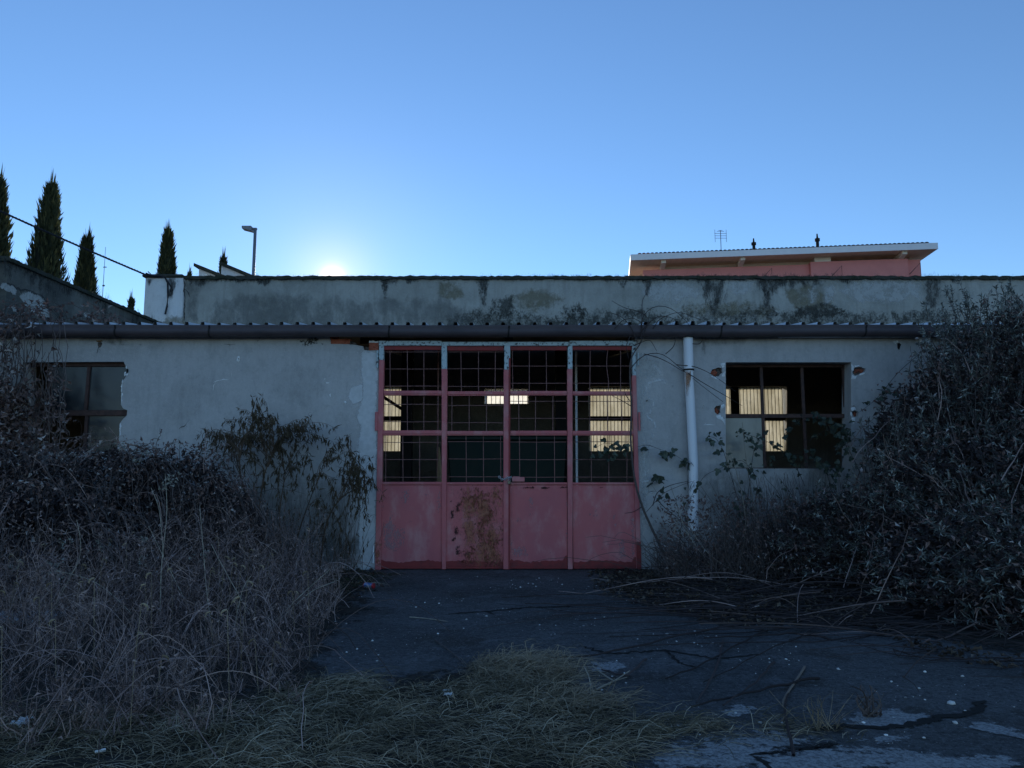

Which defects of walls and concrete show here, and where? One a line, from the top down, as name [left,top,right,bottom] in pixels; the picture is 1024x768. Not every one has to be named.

water stain [189,275,278,286]
water stain [447,274,959,325]
spalling [330,337,379,350]
spalling [711,363,725,380]
spalling [851,364,865,379]